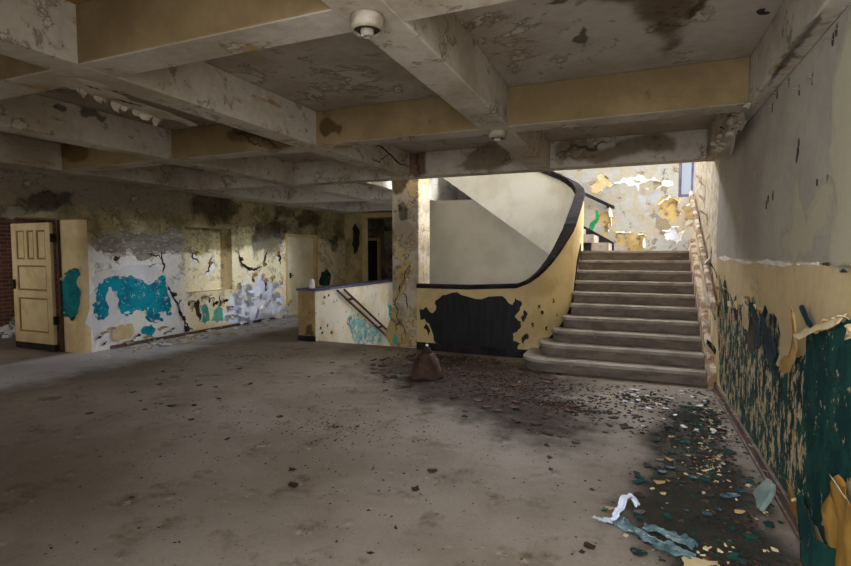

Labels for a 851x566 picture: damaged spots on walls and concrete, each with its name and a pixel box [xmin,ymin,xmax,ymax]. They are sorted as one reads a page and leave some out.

leakage [618,0,706,49]
crack [148,252,193,332]
flaking render [60,227,292,347]
peeling [698,251,851,566]